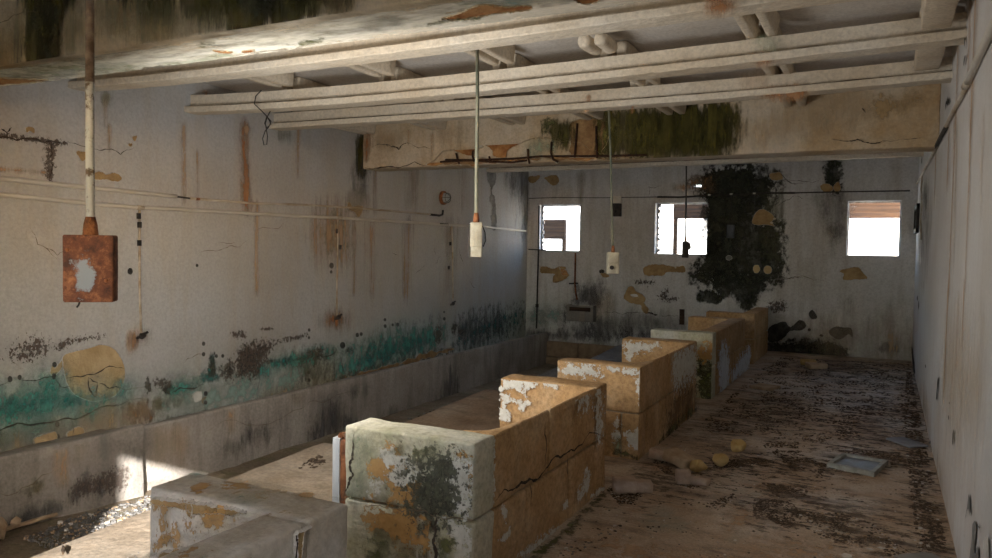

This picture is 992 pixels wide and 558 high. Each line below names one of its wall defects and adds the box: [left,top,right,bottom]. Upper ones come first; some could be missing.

leakage [23,0,62,61]
leakage [221,0,336,29]
peeling [0,0,660,87]
crack [0,127,131,177]
leakage [600,101,740,154]
leakage [680,163,789,315]
leakage [2,332,106,364]
leakage [129,284,659,423]
peeling [498,340,662,451]
crack [344,434,354,495]
peeling [150,479,252,558]
crack [430,517,438,558]